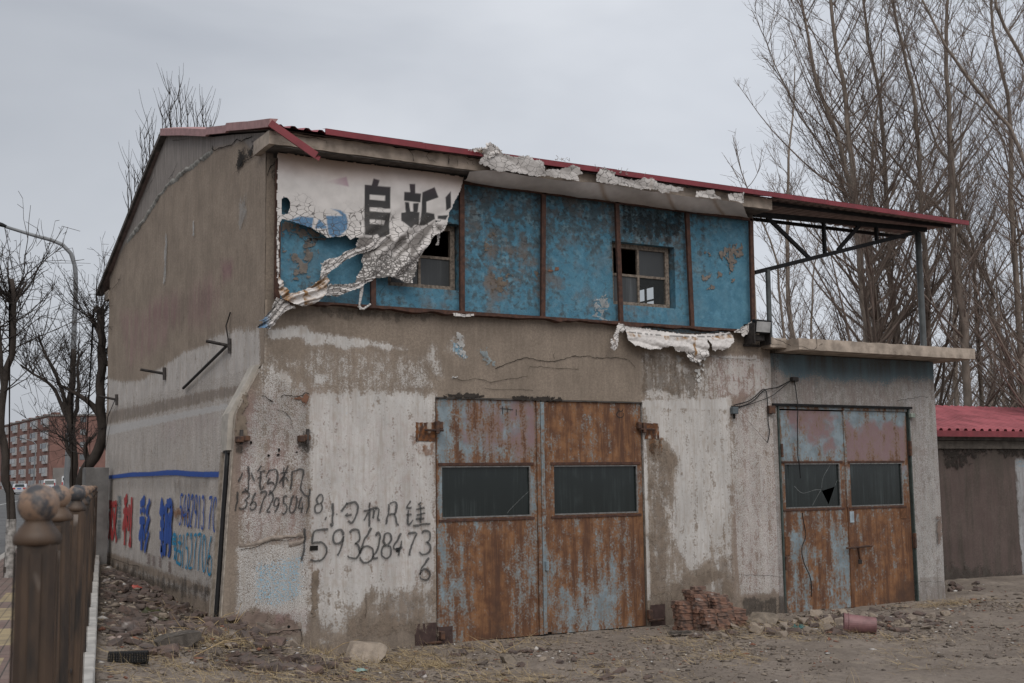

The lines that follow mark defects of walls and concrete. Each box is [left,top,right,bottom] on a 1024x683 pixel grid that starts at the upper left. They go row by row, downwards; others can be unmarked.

crack [214,136,275,176]
peeling [281,221,326,284]
peeling [702,243,744,290]
crack [453,354,635,391]
water stain [646,440,790,616]
water stain [346,587,440,637]